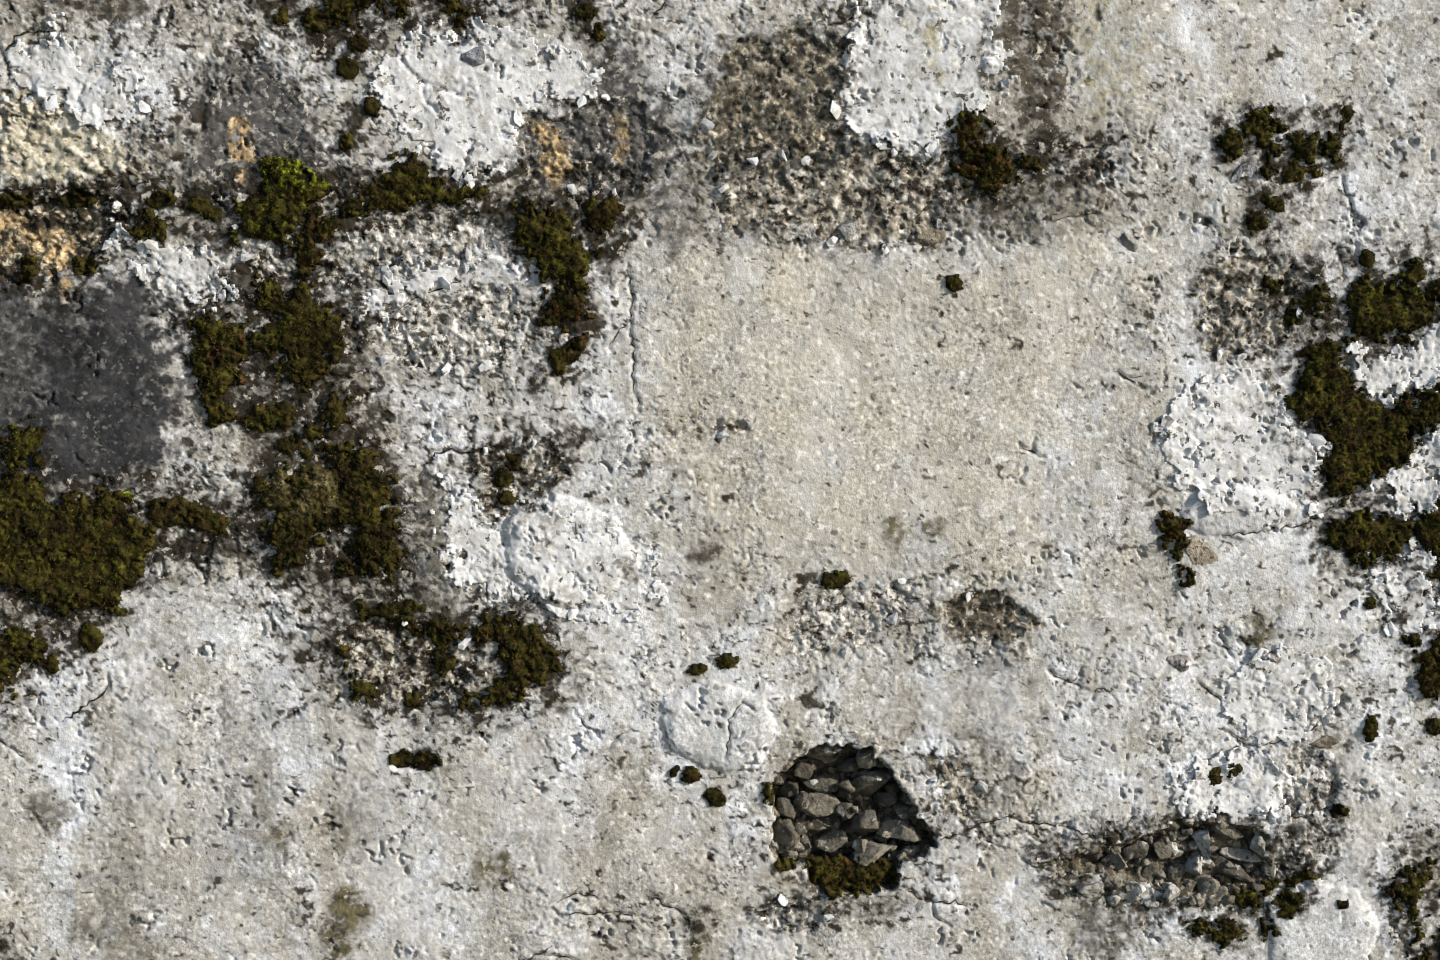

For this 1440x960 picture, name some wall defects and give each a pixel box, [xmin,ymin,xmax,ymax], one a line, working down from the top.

leakage [977,0,1073,151]
leakage [185,51,326,259]
leakage [230,284,375,507]
leakage [524,343,555,399]
leakage [553,415,620,448]
leakage [385,484,460,626]
leakage [687,542,724,579]
leakage [1246,616,1276,648]
leakage [51,608,170,865]
spalling [748,743,938,942]
spalling [924,754,994,822]
spalling [1034,643,1359,910]